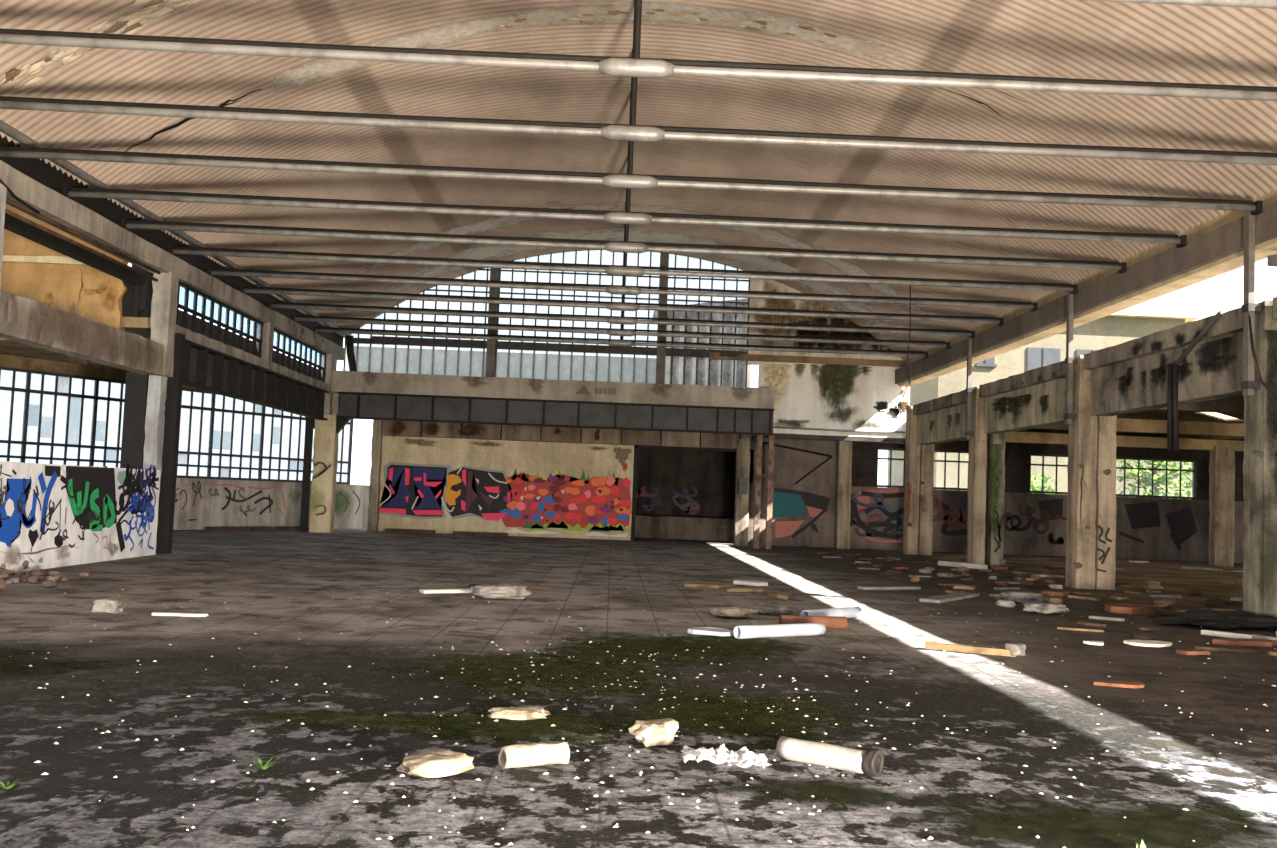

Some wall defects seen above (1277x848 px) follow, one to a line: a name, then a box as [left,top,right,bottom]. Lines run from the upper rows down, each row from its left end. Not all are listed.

peeling [89,0,201,35]
peeling [560,9,848,47]
peeling [0,47,96,91]
crack [125,89,262,152]
leakage [374,204,891,350]
leakage [721,219,926,315]
leakage [465,376,482,386]
leakage [529,379,542,391]
leakage [795,364,871,405]
leakage [1118,337,1236,394]
leakage [993,394,1048,422]
leakage [1266,330,1277,489]